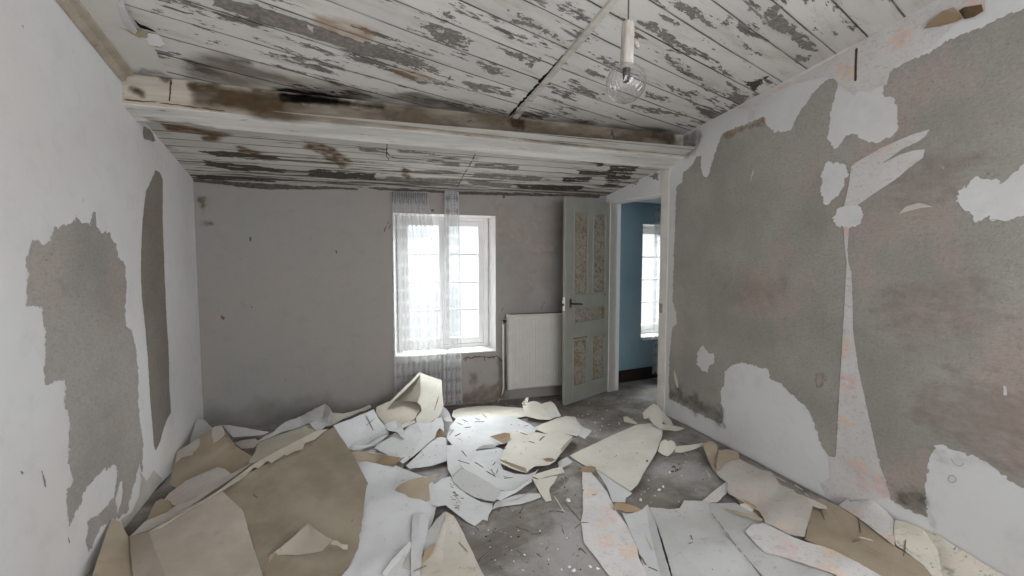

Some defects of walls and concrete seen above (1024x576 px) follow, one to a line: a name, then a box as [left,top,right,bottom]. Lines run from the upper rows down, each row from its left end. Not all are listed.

peeling [212,0,442,76]
peeling [414,9,474,52]
peeling [636,0,717,80]
damp [191,87,675,150]
peeling [461,61,515,97]
crack [508,52,566,129]
peeling [563,54,620,99]
peeling [623,84,702,117]
peeling [196,151,286,182]
peeling [307,147,659,198]
peeling [669,4,1024,517]
flaking render [25,170,171,552]